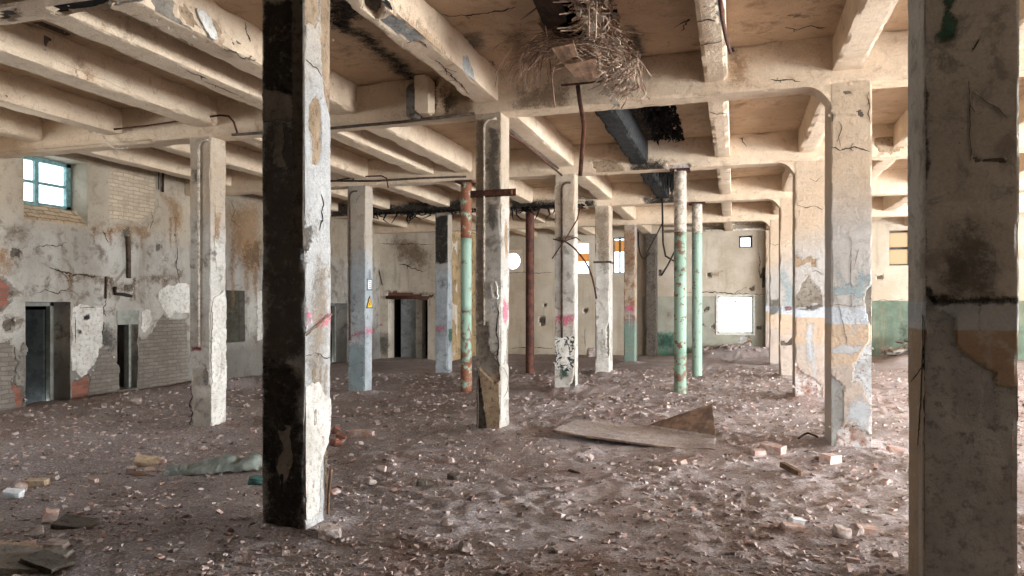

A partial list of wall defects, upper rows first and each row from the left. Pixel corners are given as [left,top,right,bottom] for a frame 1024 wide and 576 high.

flaking render [305,0,334,165]
crack [831,121,870,152]
flaking render [0,279,16,322]
crack [36,242,106,343]
flaking render [795,251,825,311]
water stain [926,219,1019,306]
flaking render [72,332,120,399]
flaking render [792,341,874,448]
flaking render [922,297,1024,576]